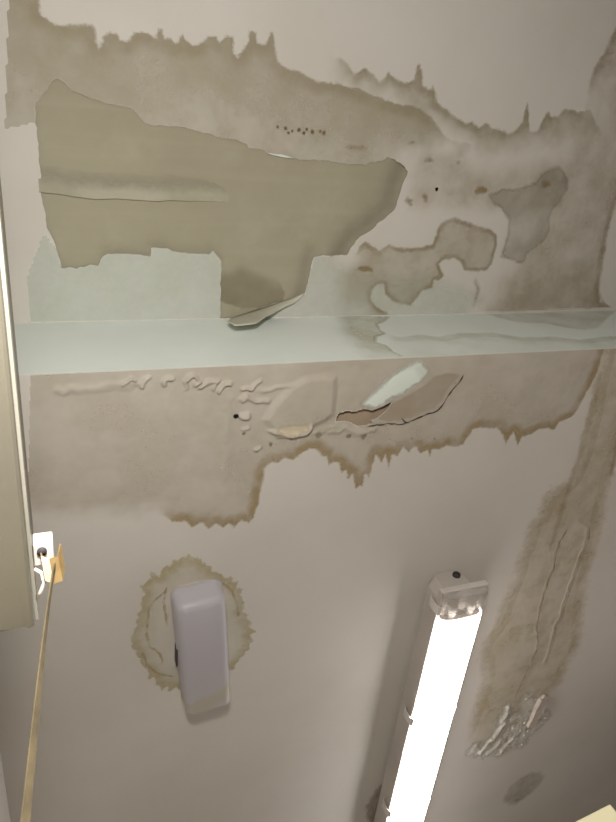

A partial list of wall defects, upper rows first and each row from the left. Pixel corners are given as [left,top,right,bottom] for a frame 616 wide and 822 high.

leakage [5,0,434,155]
peeling [27,79,408,326]
peeling [336,362,427,426]
spalling [466,693,551,758]